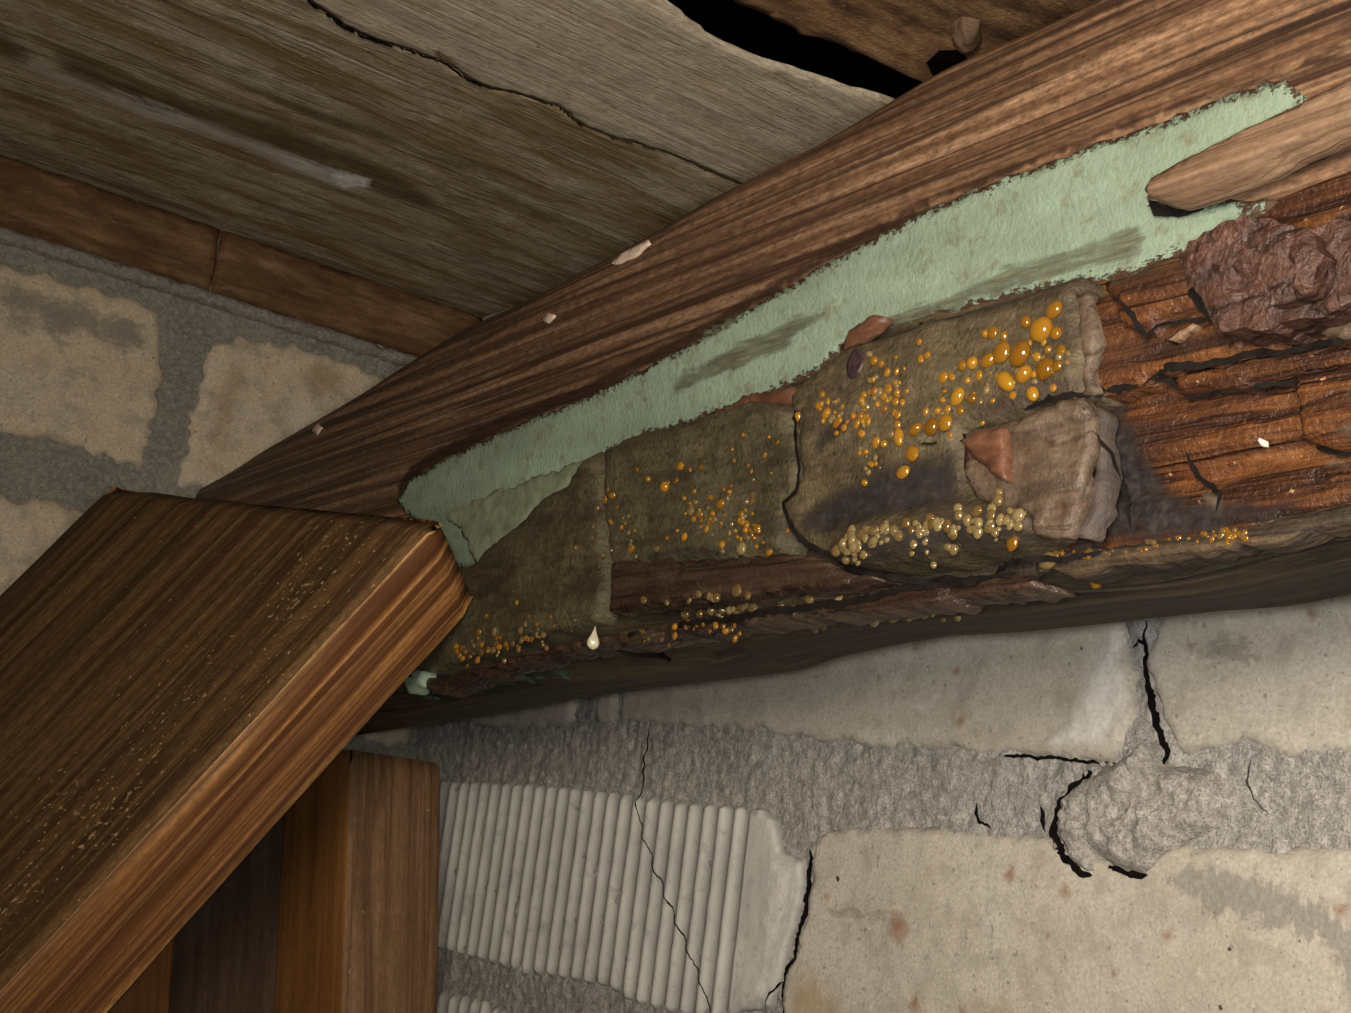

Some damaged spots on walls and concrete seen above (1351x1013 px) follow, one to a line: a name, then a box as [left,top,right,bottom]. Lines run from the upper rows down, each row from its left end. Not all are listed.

crack [307,0,739,184]
crack [1133,622,1171,765]
crack [635,729,711,1013]
crack [765,850,813,1013]
crack [974,803,991,828]
crack [1003,753,1148,879]